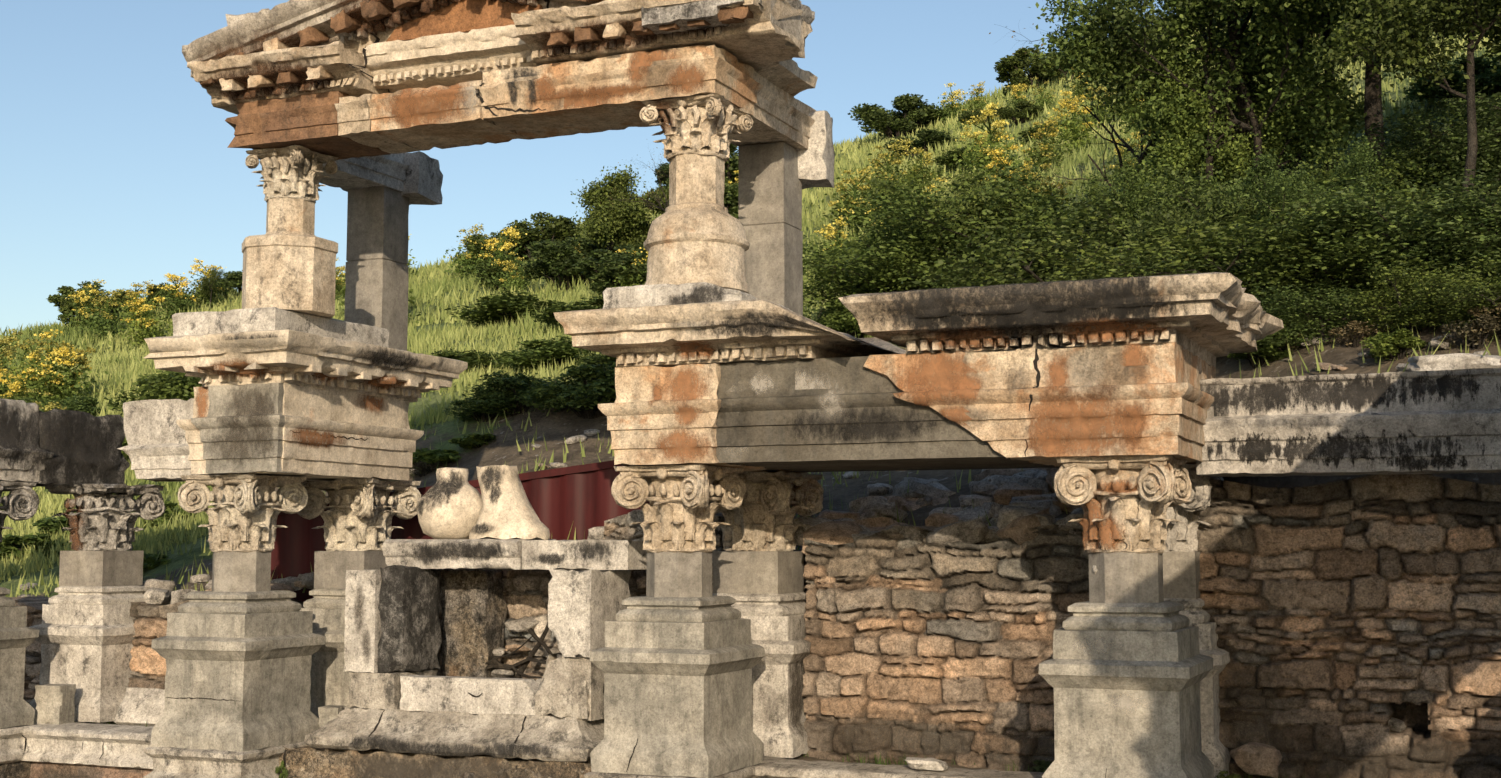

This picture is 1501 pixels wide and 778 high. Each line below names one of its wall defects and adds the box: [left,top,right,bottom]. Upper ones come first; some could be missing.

damp [850,275,1213,348]
damp [0,399,114,479]
crack [1024,348,1041,457]
damp [1200,369,1501,471]